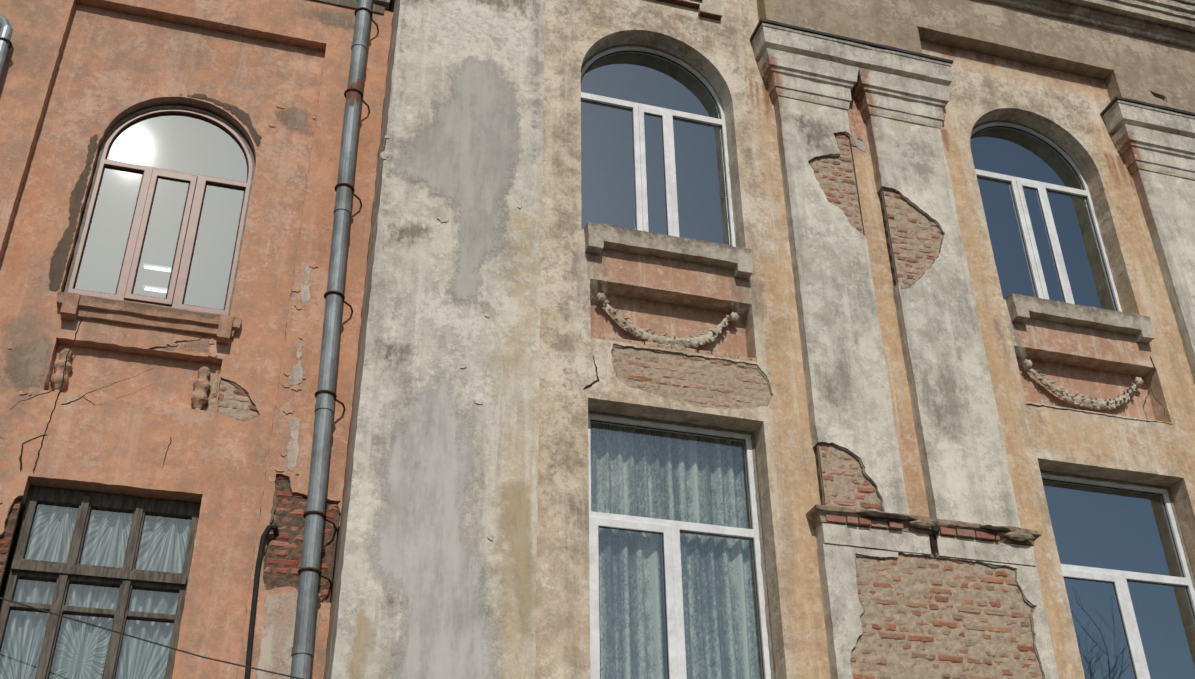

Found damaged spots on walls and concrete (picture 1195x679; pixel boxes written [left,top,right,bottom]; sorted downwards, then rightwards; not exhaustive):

flaking render [49,134,98,291]
water stain [389,224,428,243]
flaking render [808,132,867,236]
flaking render [880,187,944,289]
crack [1,319,205,473]
flaking render [166,339,260,422]
flaking render [603,336,773,409]
flaking render [816,442,884,512]
flaking render [0,496,23,589]
flaking render [256,409,307,679]
flaking render [314,499,340,637]
flaking render [850,548,1044,679]